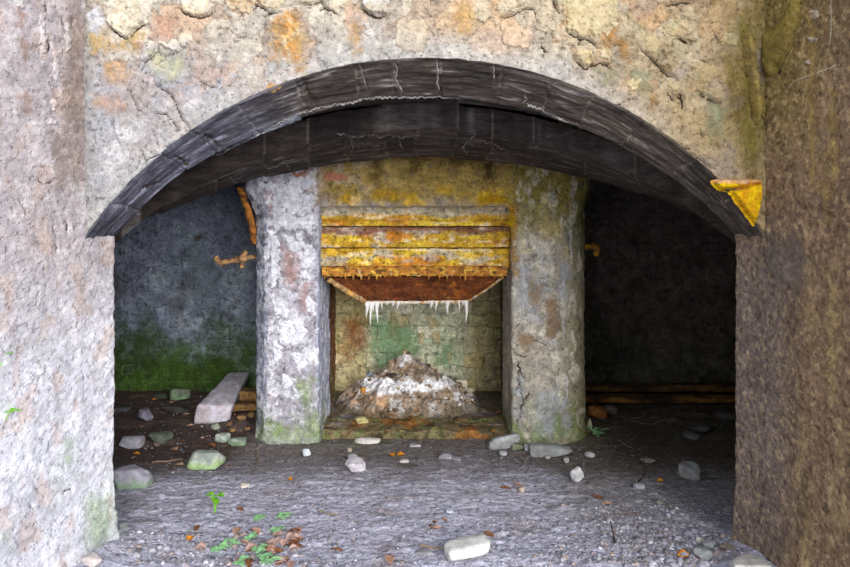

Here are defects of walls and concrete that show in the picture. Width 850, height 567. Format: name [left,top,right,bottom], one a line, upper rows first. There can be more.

crack [131,47,219,166]
crack [337,133,413,153]
crack [640,48,718,110]
corrosion [322,197,518,281]
crack [514,323,546,426]